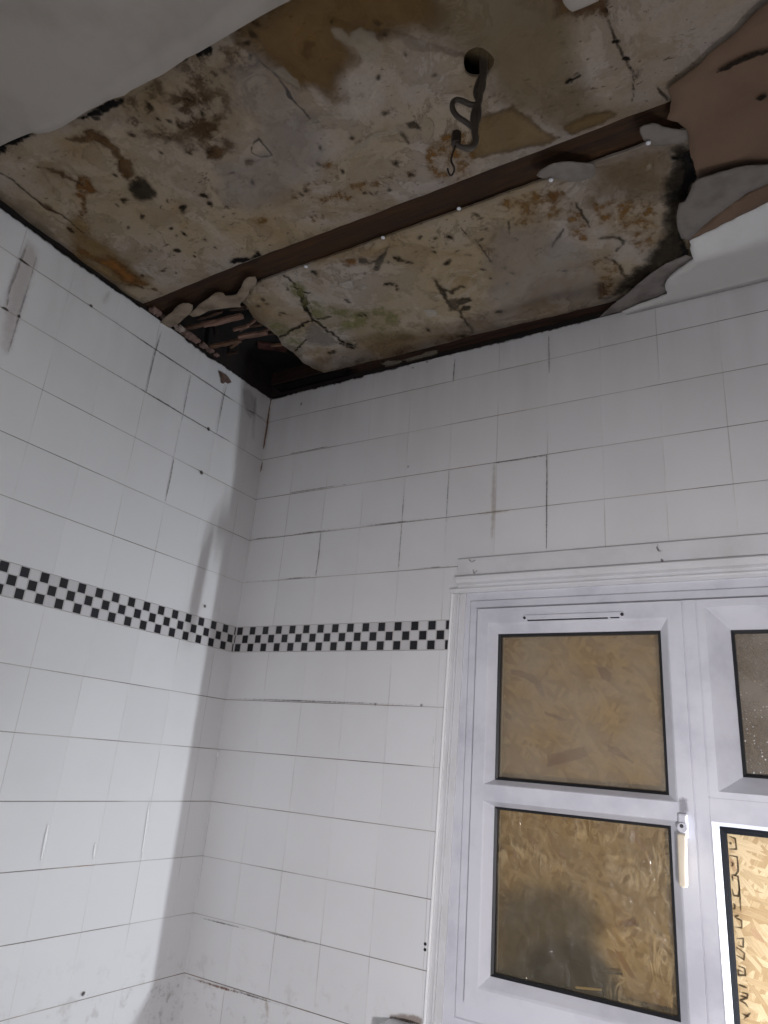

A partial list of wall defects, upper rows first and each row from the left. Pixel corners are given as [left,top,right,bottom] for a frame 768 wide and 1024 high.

peeling [554,0,607,17]
crack [605,8,668,100]
water stain [68,0,616,213]
water stain [593,145,690,299]
crack [279,275,358,351]
peeling [359,252,386,271]
flaking render [435,281,474,333]
flaking render [600,255,693,317]